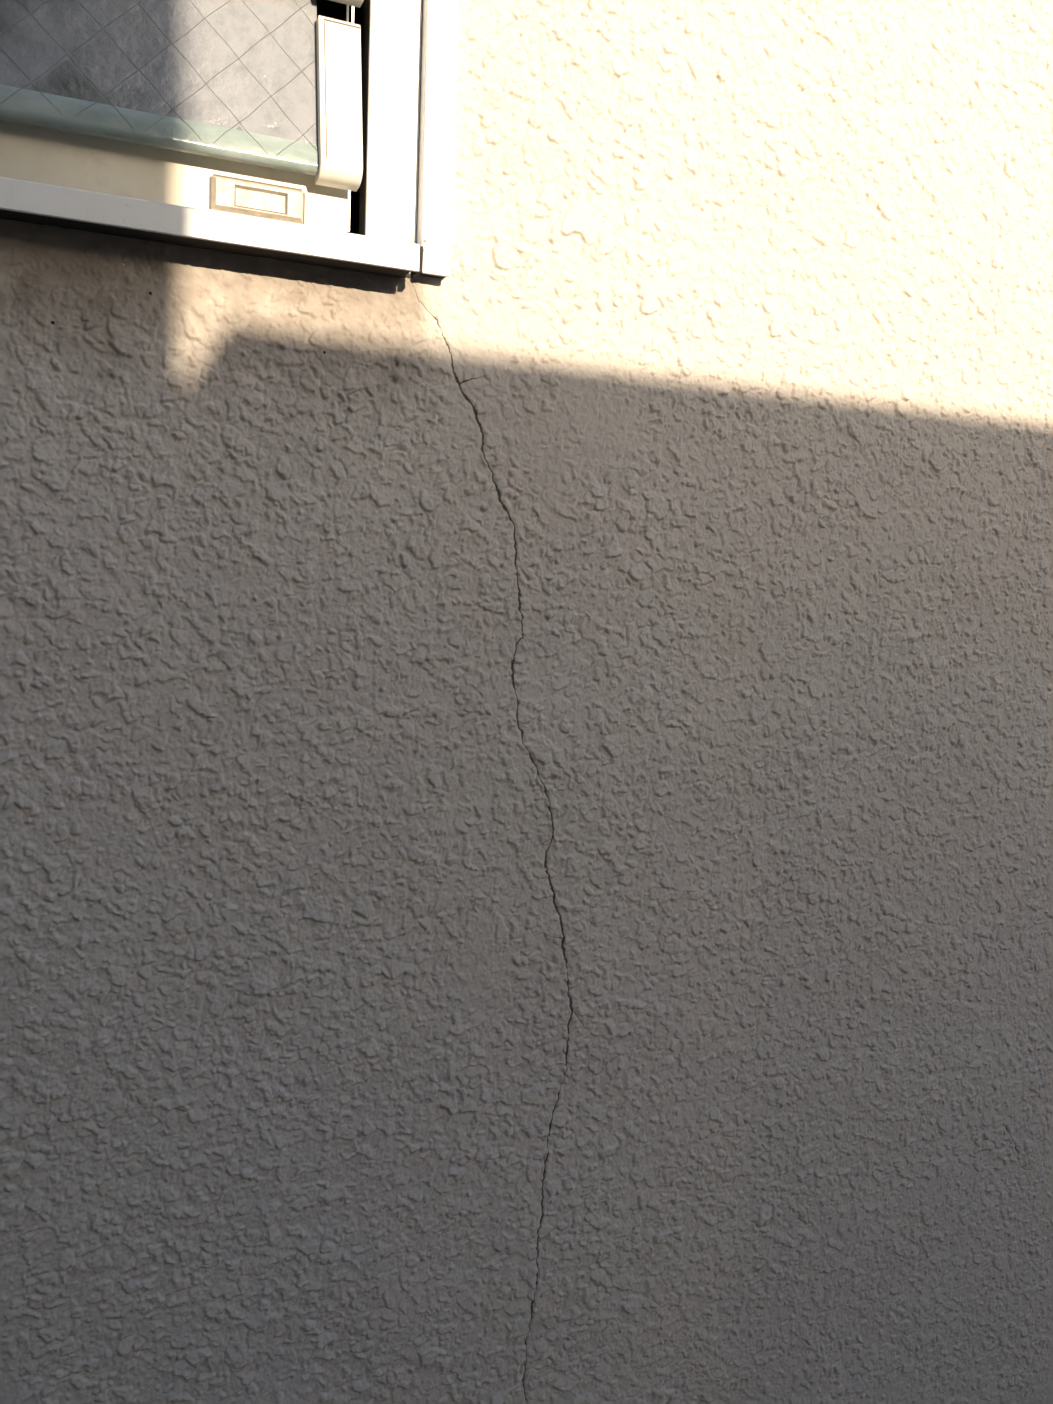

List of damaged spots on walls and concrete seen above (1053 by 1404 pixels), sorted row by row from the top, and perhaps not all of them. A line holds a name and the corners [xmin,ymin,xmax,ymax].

crack [408,278,585,1401]